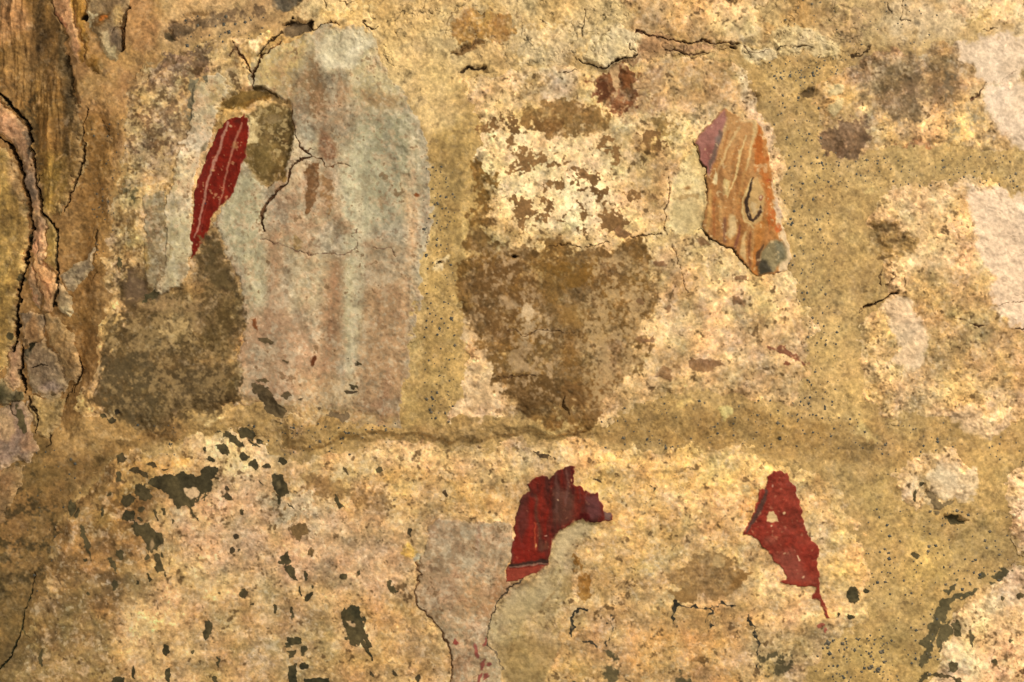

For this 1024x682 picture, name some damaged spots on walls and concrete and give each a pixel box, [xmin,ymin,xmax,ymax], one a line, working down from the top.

crack [228,0,379,86]
crack [260,110,395,256]
crack [0,93,110,448]
leakage [451,96,672,438]
leakage [88,218,395,585]
leakage [385,579,399,595]
crack [414,562,453,681]
crack [486,578,524,671]